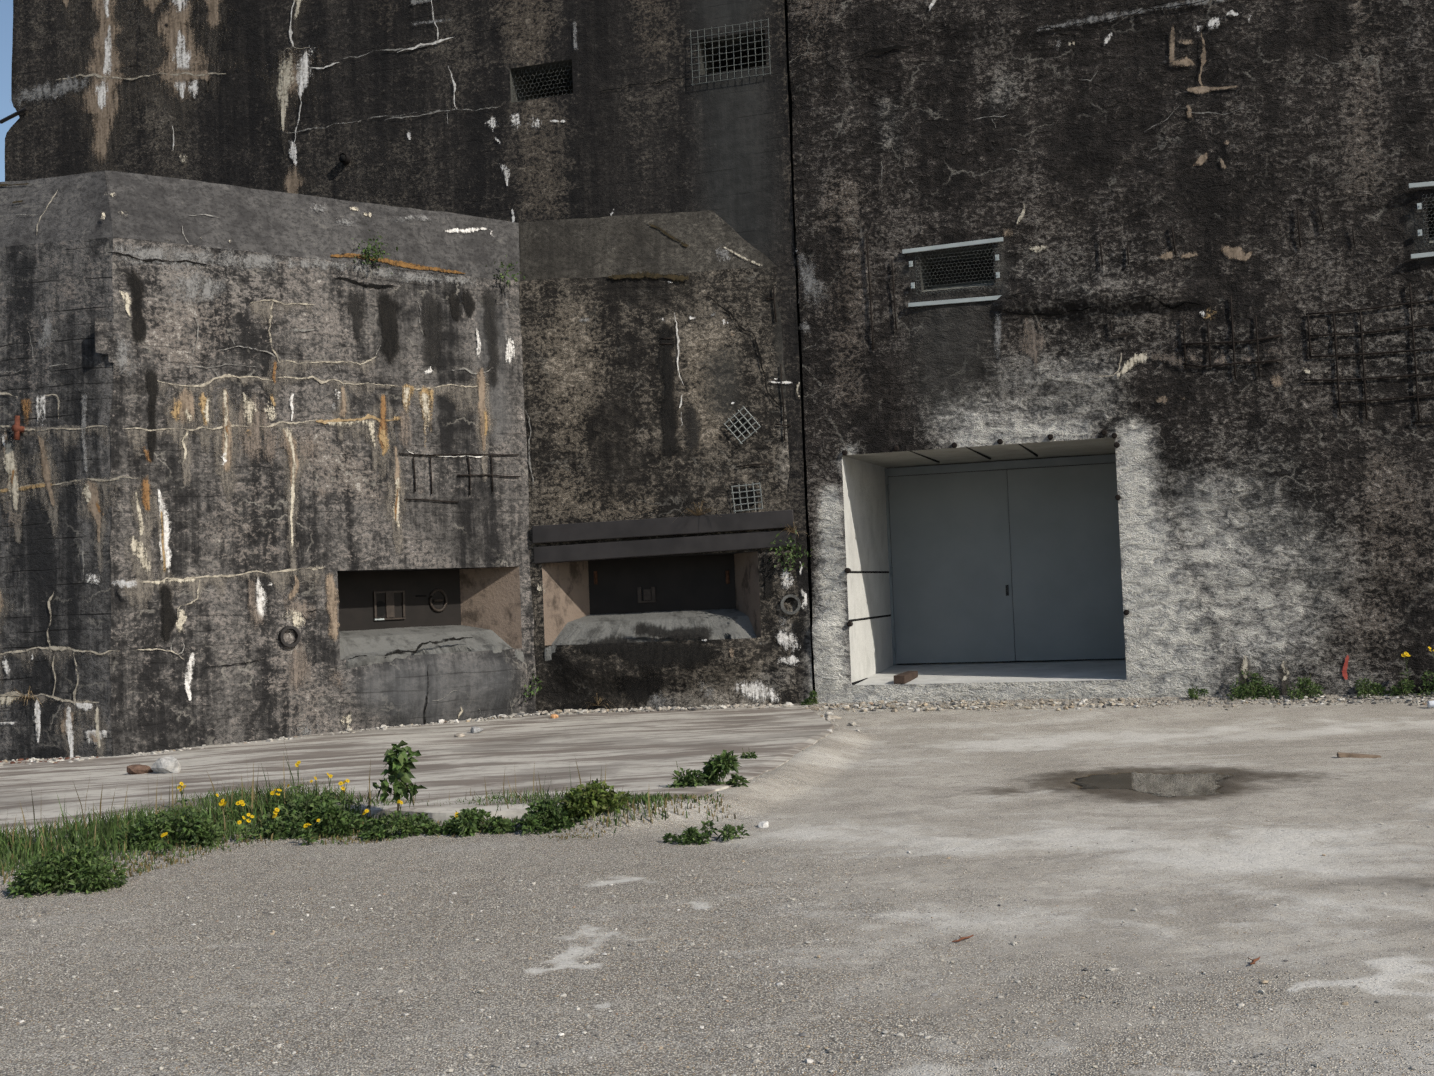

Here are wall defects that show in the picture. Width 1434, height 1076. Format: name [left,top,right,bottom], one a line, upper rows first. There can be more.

efflorescence [60,0,231,172]
efflorescence [270,0,314,194]
crack [287,0,498,142]
corrosion [0,392,60,425]
leakage [127,269,146,342]
crack [0,298,490,505]
leakage [349,291,399,363]
leakage [422,288,515,481]
spalling [1100,353,1198,377]
spalling [1304,283,1434,423]
crack [0,550,325,725]
crack [350,637,481,724]